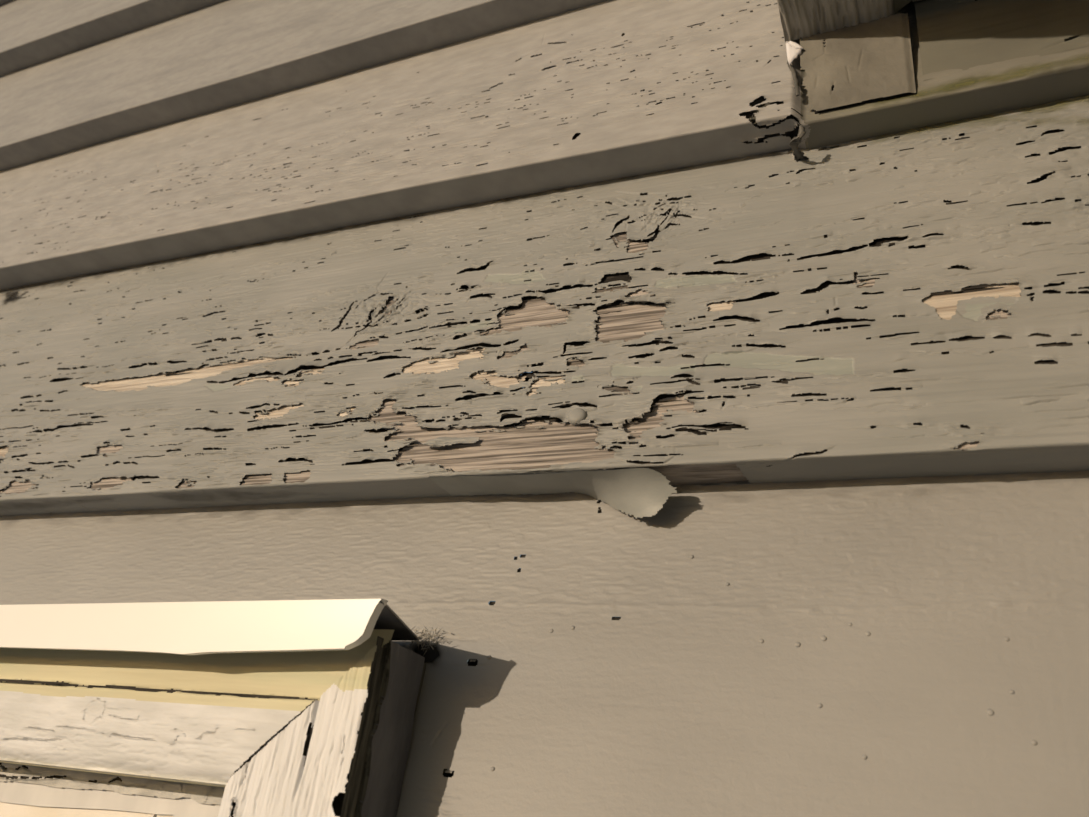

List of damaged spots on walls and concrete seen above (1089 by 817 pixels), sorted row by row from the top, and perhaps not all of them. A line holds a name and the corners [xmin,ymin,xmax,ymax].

peeling [786,41,803,65]
peeling [734,93,807,143]
peeling [914,276,1032,328]
peeling [395,275,740,401]
peeling [75,351,330,425]
peeling [597,350,854,399]
peeling [0,473,39,499]
peeling [82,471,135,496]
peeling [171,474,202,492]
peeling [236,465,319,489]
peeling [332,387,758,519]
peeling [942,433,992,454]